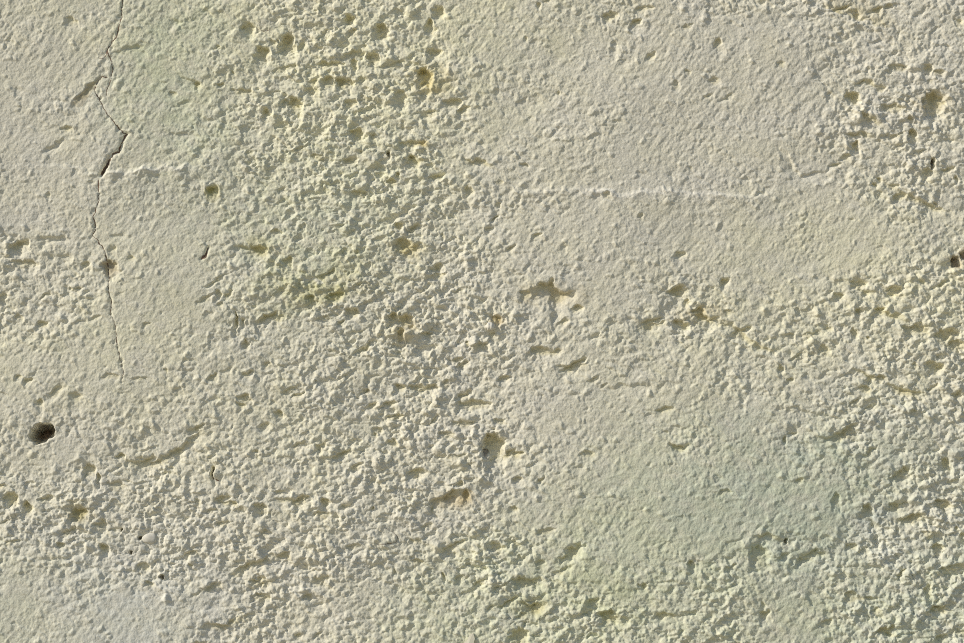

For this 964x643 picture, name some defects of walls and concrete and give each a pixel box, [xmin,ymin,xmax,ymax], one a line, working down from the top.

crack [92,0,128,376]